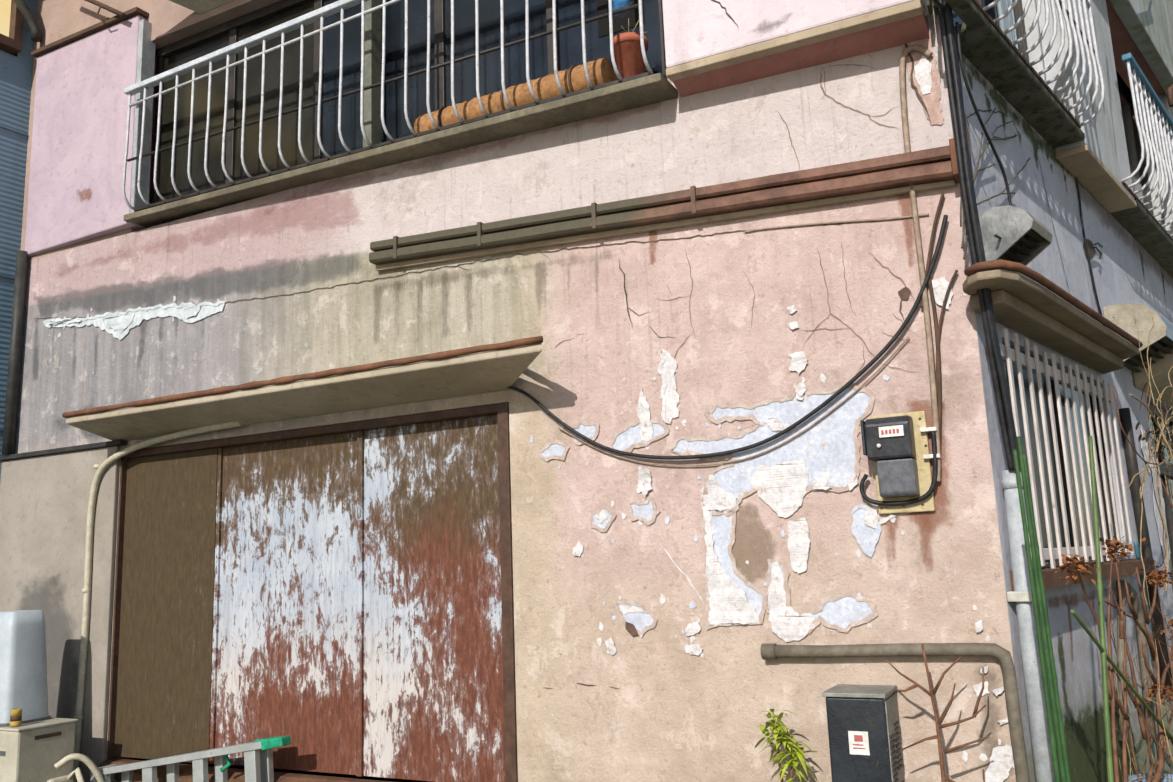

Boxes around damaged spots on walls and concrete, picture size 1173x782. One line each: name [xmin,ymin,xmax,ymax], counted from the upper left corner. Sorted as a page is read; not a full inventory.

crack [712,0,739,30]
crack [820,64,897,128]
crack [776,110,800,169]
damp [985,94,1067,191]
peeling [43,296,225,340]
crack [225,230,748,359]
crack [789,221,918,372]
peeling [530,420,599,469]
peeling [611,349,878,658]
peeling [851,503,905,558]
damp [1058,636,1069,730]
peeling [962,739,1014,782]